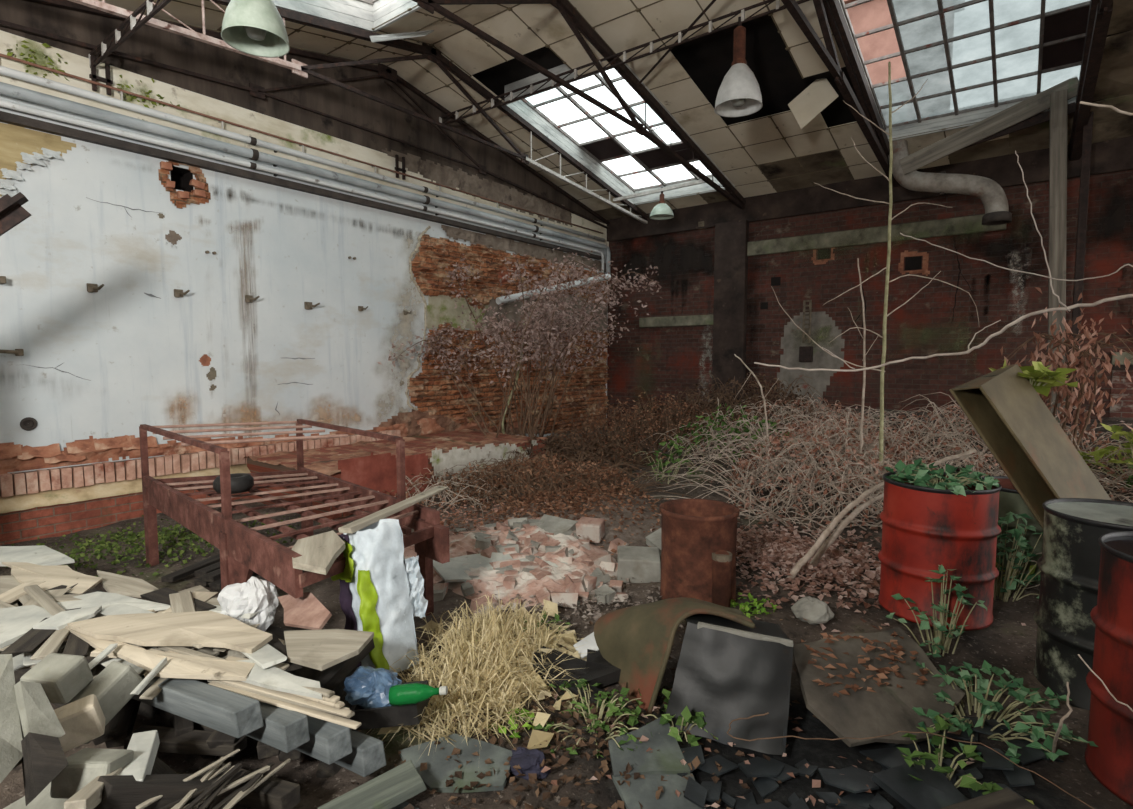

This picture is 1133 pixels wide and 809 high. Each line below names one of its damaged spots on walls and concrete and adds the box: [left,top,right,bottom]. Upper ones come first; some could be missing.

peeling [0,122,76,198]
spalling [158,161,211,248]
flaking render [0,224,610,498]